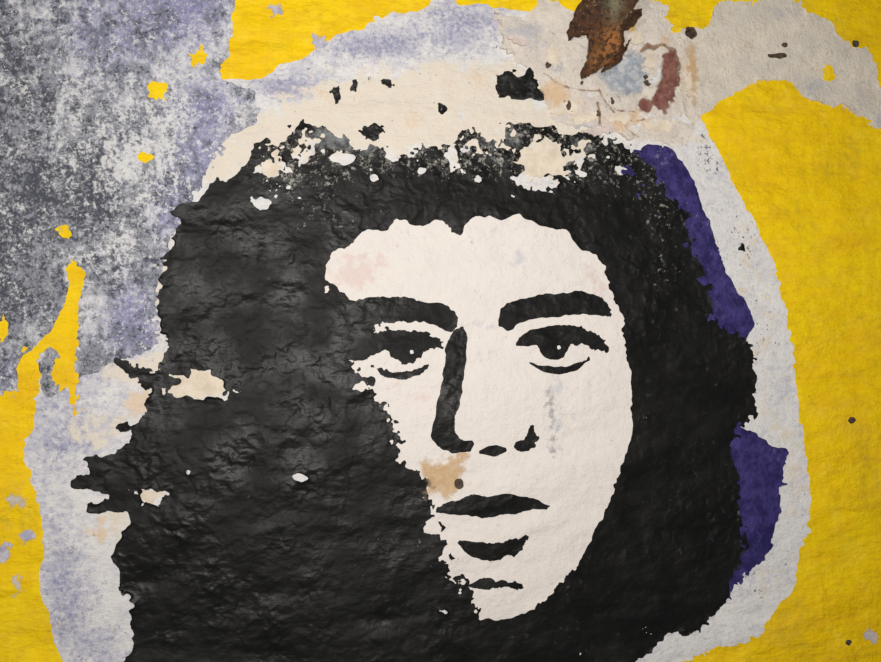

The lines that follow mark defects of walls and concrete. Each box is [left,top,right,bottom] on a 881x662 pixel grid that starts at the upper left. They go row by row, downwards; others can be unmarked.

corrosion [638,43,697,114]
flaking render [492,0,881,149]
peeling [261,150,283,177]
peeling [513,142,570,187]
peeling [5,494,26,508]
peeling [0,530,36,563]